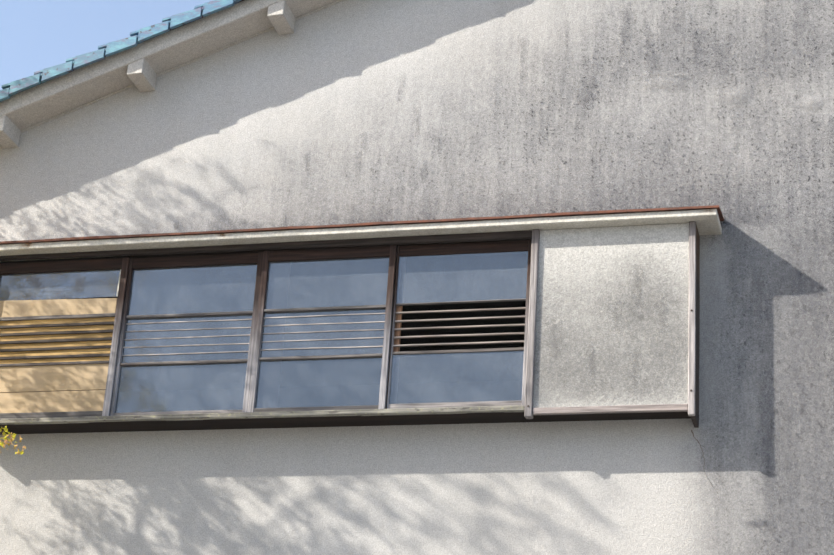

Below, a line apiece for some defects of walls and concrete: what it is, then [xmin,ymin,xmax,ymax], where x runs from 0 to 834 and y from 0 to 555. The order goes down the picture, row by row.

water stain [345,0,834,555]